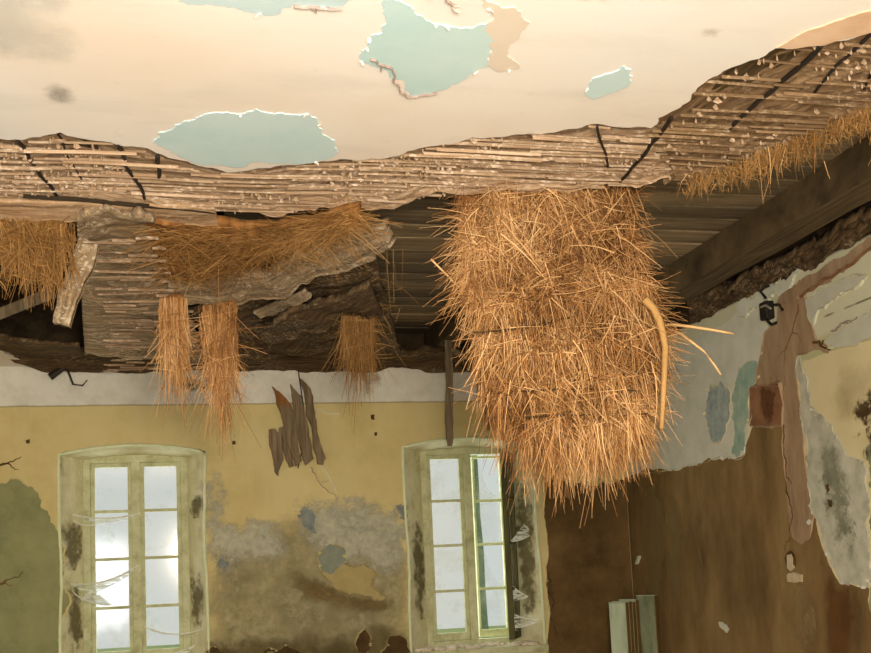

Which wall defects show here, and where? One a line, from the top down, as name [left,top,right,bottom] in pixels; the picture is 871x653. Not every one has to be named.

peeling [179,0,349,18]
crack [294,4,343,13]
peeling [359,0,530,96]
crack [446,0,461,13]
peeling [776,10,871,49]
peeling [584,65,633,99]
peeling [152,108,338,168]
flaking render [540,237,871,653]
leakage [854,391,871,456]
leakage [822,449,847,537]
peeling [0,477,72,653]
peeling [317,543,347,576]